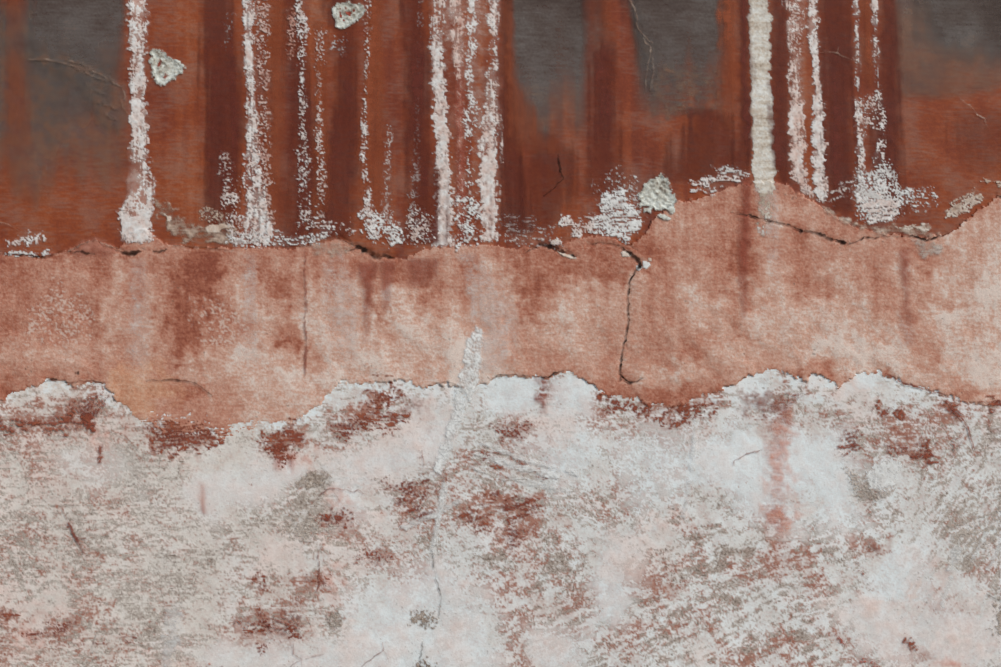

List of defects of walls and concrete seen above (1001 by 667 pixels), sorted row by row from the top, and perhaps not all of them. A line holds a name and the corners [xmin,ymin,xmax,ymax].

corrosion [860,0,871,67]
corrosion [316,40,327,187]
corrosion [365,0,383,229]
water stain [204,0,642,251]
water stain [631,0,1001,235]
crack [746,214,878,244]
crack [539,242,642,383]
peeling [0,394,109,436]
peeling [147,421,228,458]
peeling [256,418,304,468]
peeling [330,375,410,442]
peeling [597,392,718,429]